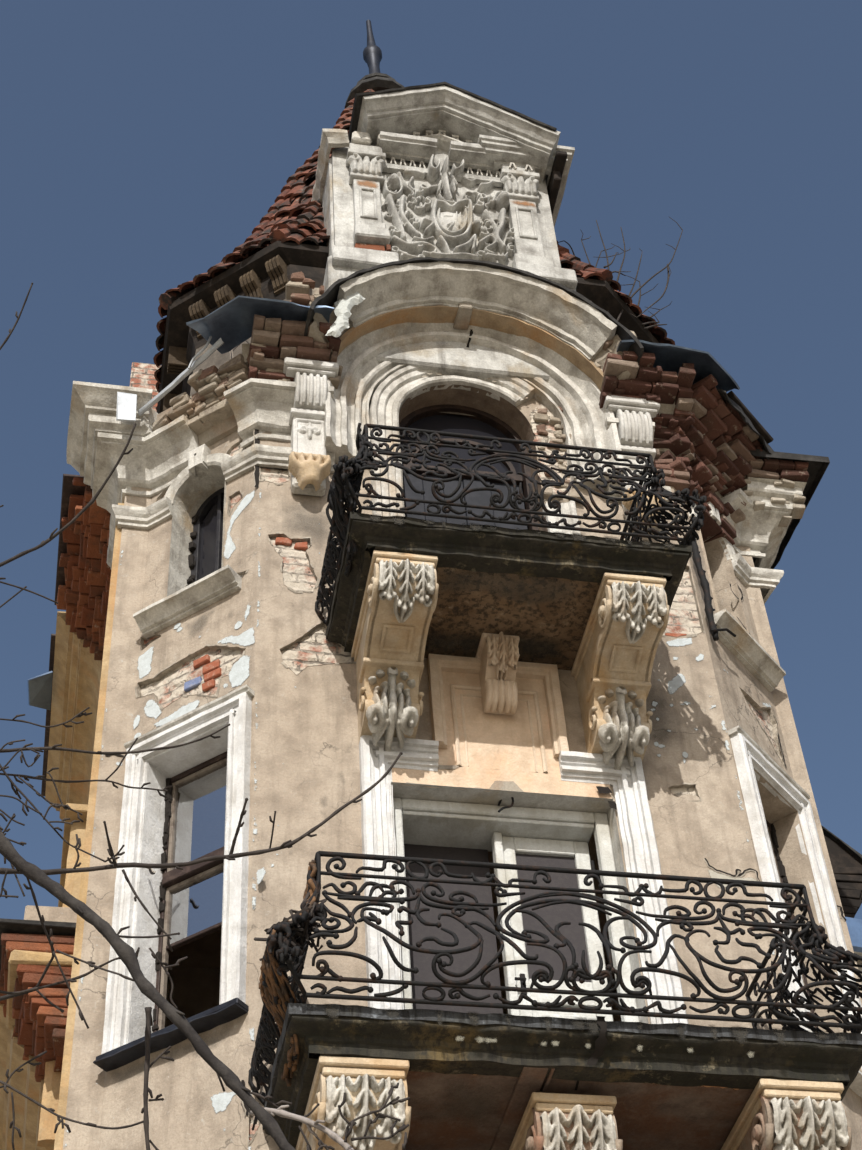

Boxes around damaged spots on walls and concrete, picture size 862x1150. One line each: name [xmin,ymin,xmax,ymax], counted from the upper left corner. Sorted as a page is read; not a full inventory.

flaking render [224,466,291,559]
flaking render [258,528,320,593]
flaking render [133,602,260,739]
flaking render [280,622,356,688]
peeling [252,854,278,909]
crack [704,858,760,881]